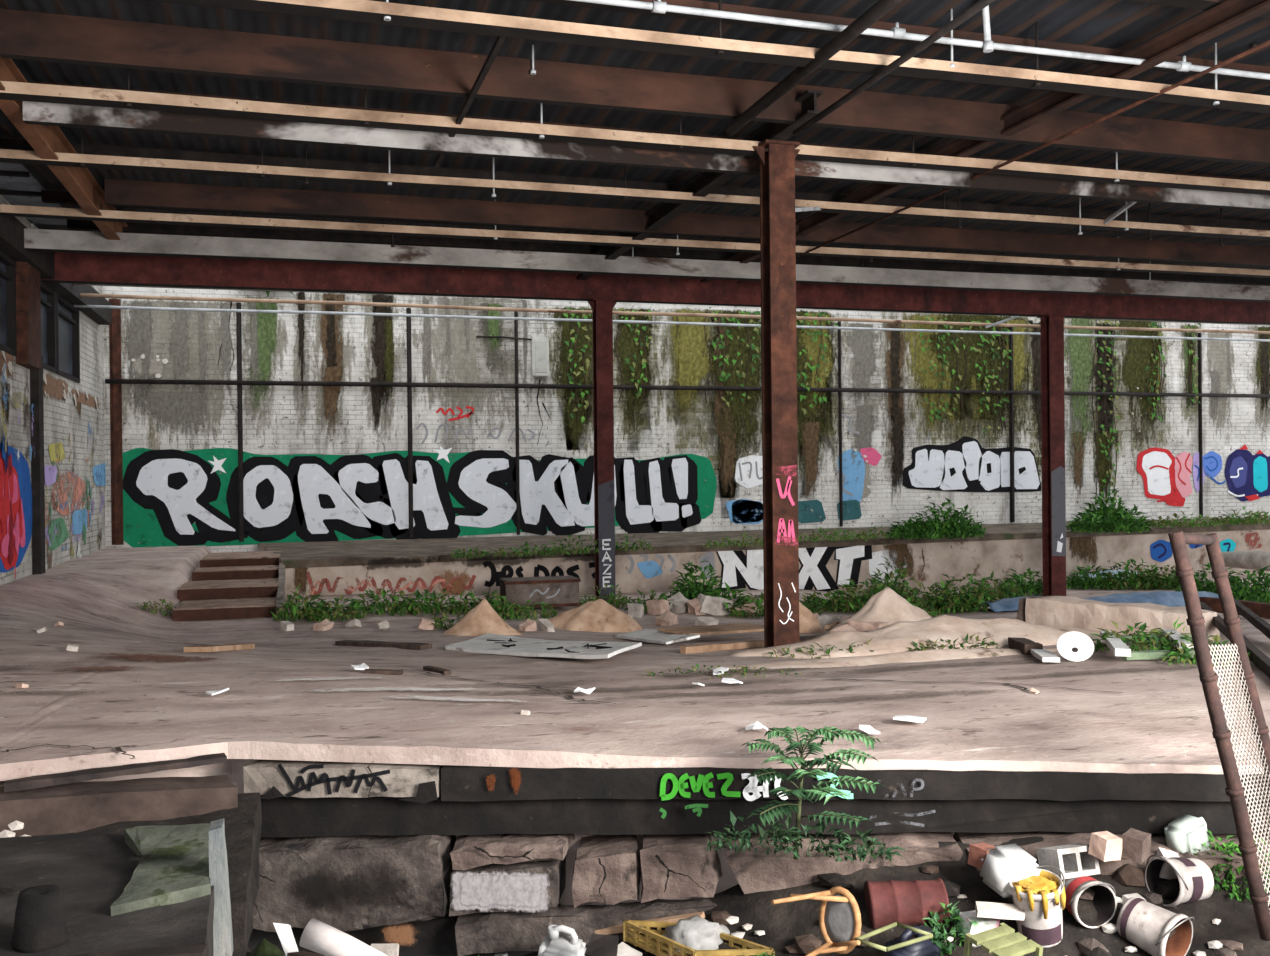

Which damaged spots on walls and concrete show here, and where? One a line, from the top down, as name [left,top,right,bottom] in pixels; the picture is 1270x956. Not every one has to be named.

water stain [121,298,277,449]
water stain [293,292,543,448]
water stain [565,358,589,446]
water stain [613,309,655,419]
water stain [714,310,762,497]
water stain [797,312,1042,498]
water stain [1064,320,1162,496]
water stain [1188,326,1270,438]